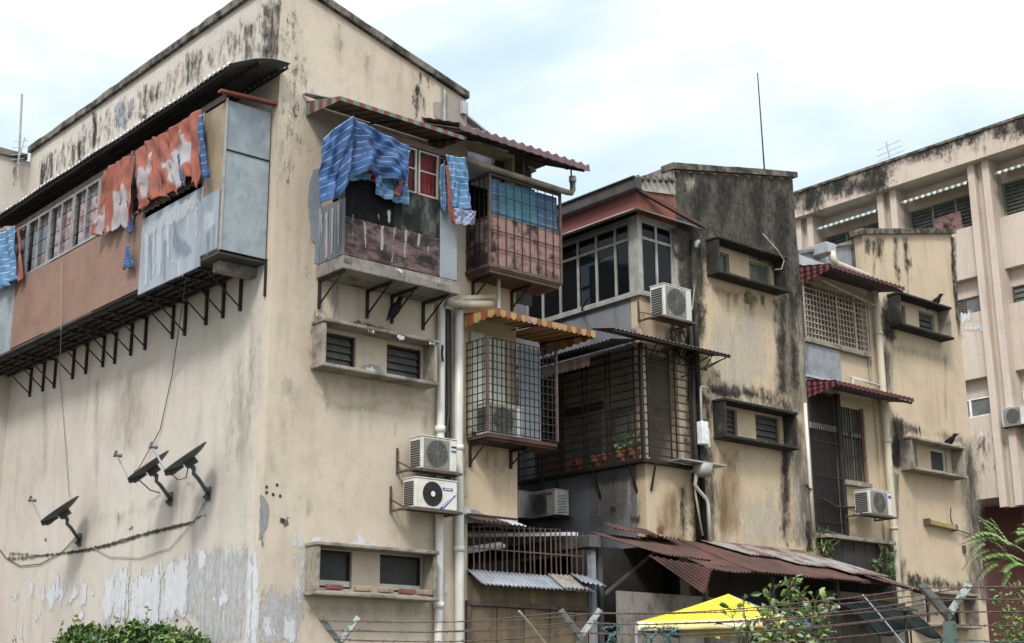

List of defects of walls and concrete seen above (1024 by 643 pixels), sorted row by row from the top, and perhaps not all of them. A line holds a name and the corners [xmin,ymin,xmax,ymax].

damp [243,1,281,60]
damp [40,112,97,185]
damp [674,179,736,299]
damp [750,117,1024,277]
damp [951,237,962,337]
damp [703,291,801,428]
damp [881,301,896,404]
damp [892,420,902,491]
peeling [11,495,389,643]
damp [901,438,987,598]